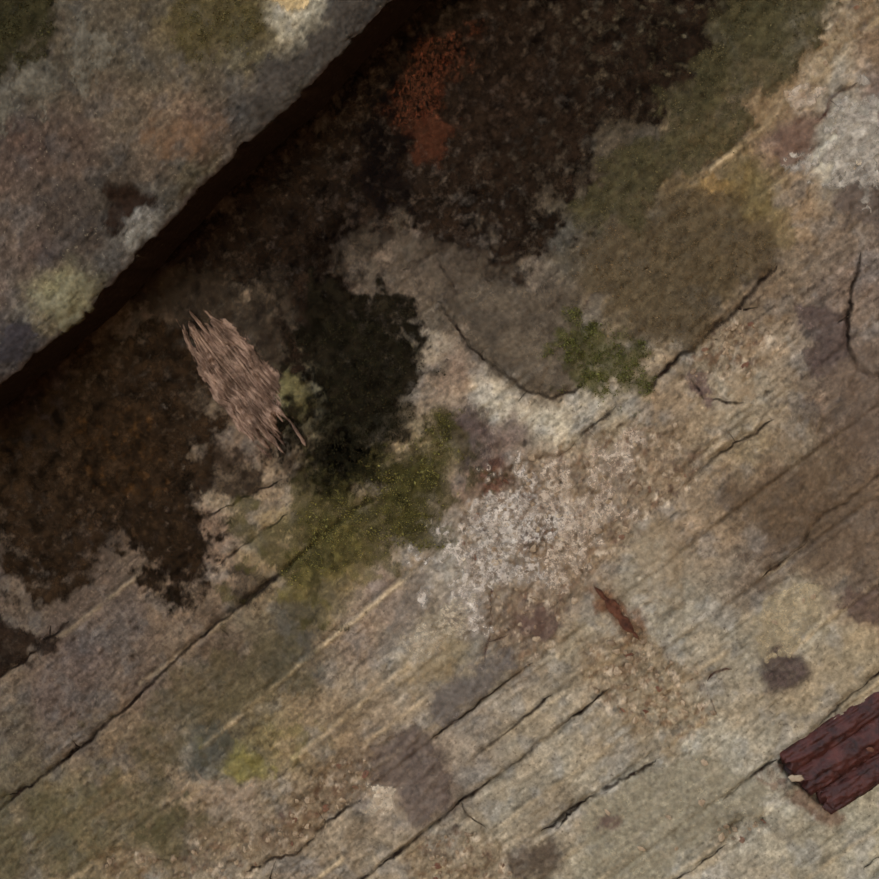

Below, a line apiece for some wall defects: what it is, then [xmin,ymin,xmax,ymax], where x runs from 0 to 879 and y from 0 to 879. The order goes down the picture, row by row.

crack [837,253,879,377]
leakage [0,319,233,612]
leakage [0,658,11,676]
crack [0,494,382,810]
crack [429,663,532,741]
crack [490,696,550,746]
crack [568,690,607,721]
crack [437,781,489,829]
crack [362,837,418,879]